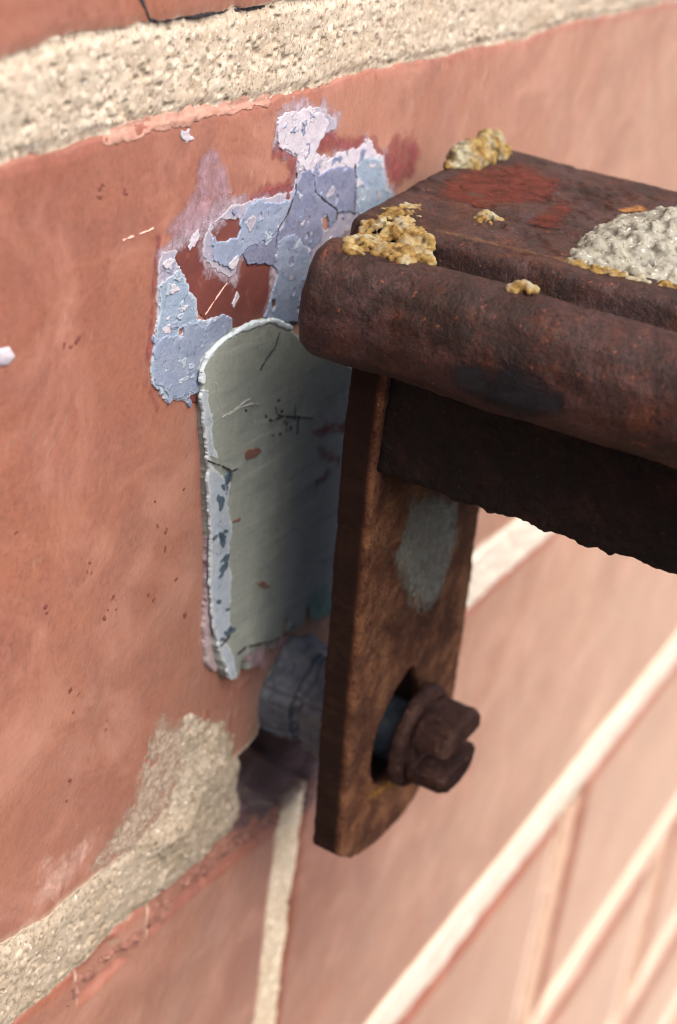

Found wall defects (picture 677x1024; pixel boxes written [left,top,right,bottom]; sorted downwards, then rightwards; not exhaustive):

spalling [103,93,271,146]
peeling [150,106,394,680]